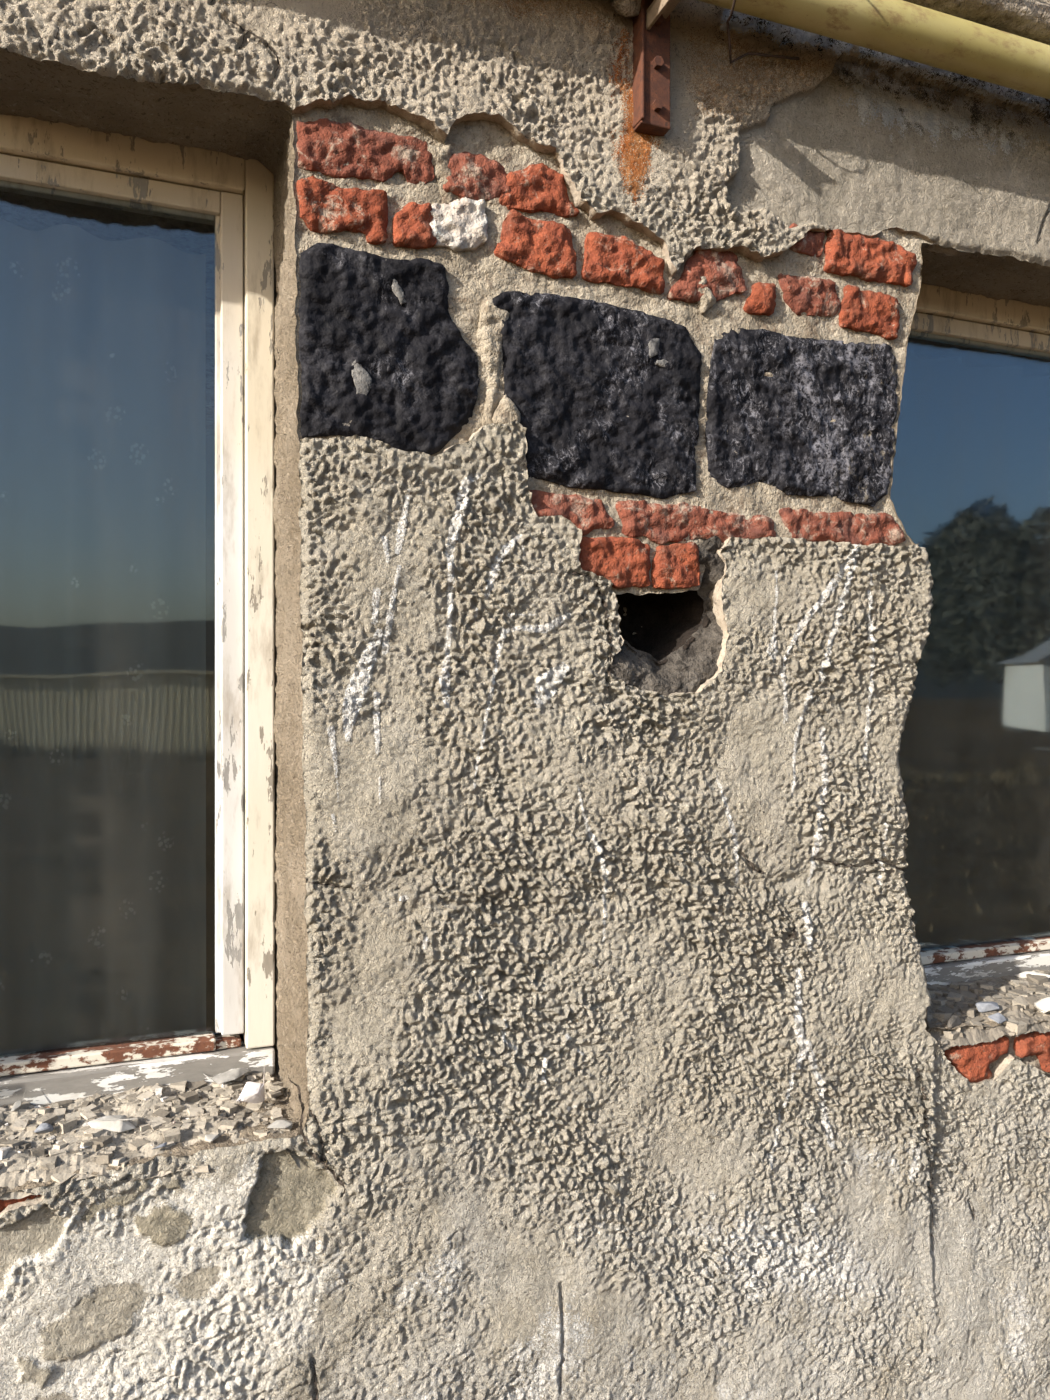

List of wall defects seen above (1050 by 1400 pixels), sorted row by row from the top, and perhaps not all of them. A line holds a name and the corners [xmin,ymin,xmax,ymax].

crack [210,0,280,85]
corrosion [607,27,662,212]
spalling [281,6,1050,696]
spalling [925,1023,1050,1083]
peeling [243,1148,338,1245]
crack [288,1077,345,1200]